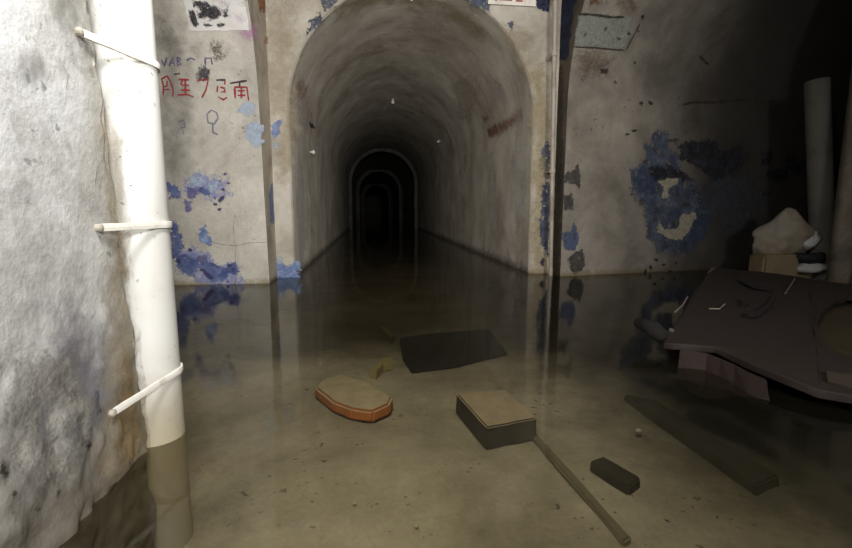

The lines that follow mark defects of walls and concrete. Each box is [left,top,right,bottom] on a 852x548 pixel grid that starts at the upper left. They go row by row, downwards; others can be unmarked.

peeling [305,0,337,36]
peeling [467,0,490,12]
peeling [237,102,284,149]
peeling [166,170,233,213]
peeling [539,141,551,266]
peeling [563,164,580,211]
peeling [629,130,762,273]
peeling [170,220,246,287]
peeling [277,256,302,280]
peeling [561,222,585,275]